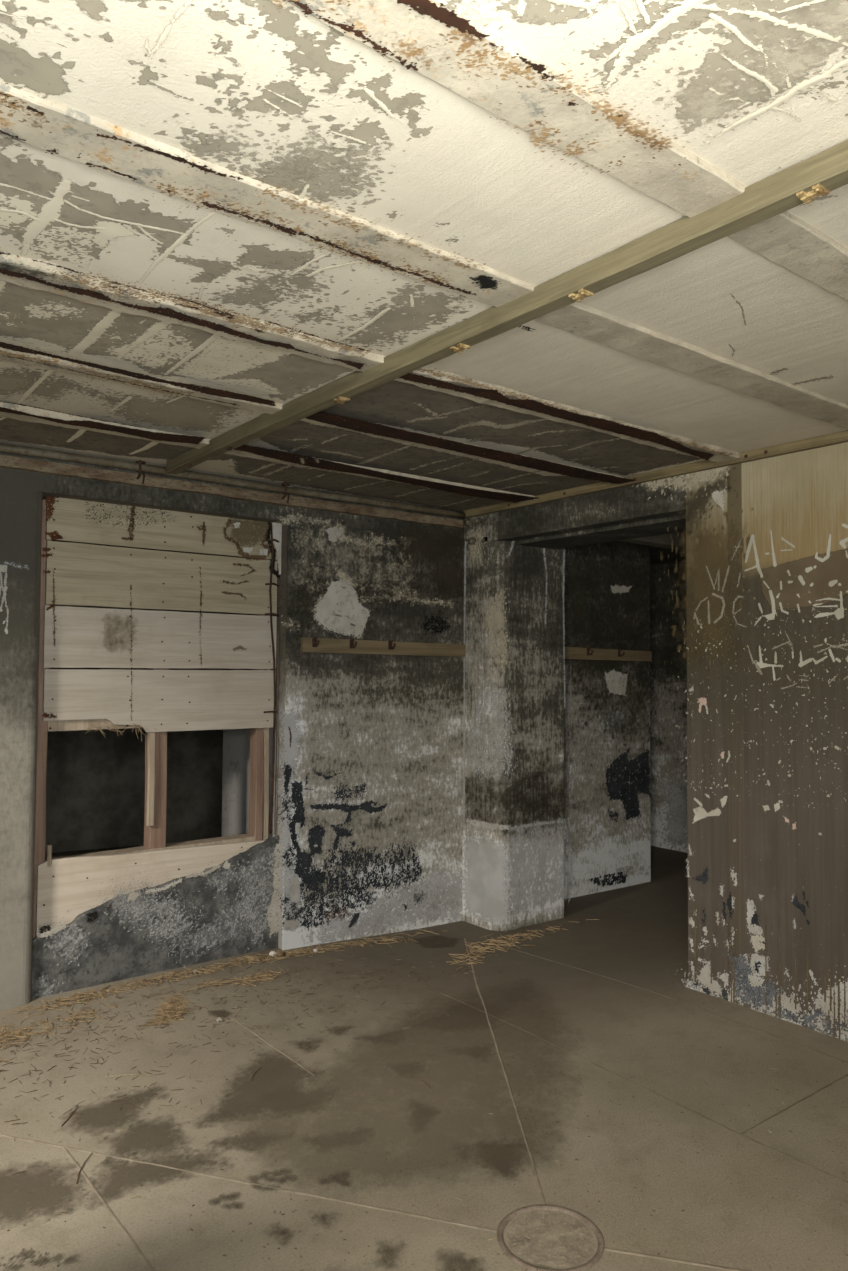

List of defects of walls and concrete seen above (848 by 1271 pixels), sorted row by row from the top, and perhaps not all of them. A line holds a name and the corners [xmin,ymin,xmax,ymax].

peeling [0,0,91,98]
peeling [154,0,433,225]
corrosion [264,0,686,173]
peeling [0,137,478,351]
peeling [0,280,353,400]
leakage [0,562,27,634]
peeling [311,568,371,640]
leakage [210,380,700,923]
leakage [34,840,276,997]
peeling [603,748,848,1042]
leakage [0,1165,72,1221]
leakage [73,1089,276,1199]